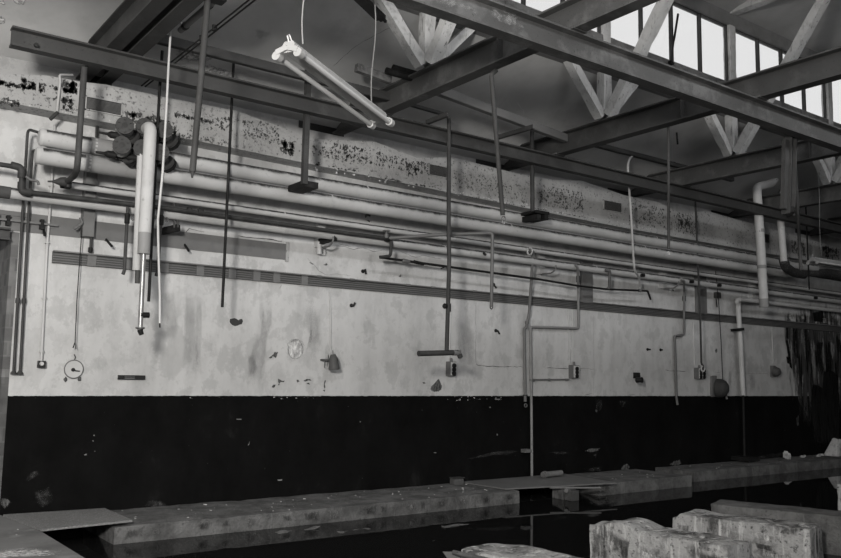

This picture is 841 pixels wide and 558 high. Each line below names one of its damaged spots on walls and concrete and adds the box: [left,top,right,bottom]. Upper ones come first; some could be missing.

peeling [0,78,88,117]